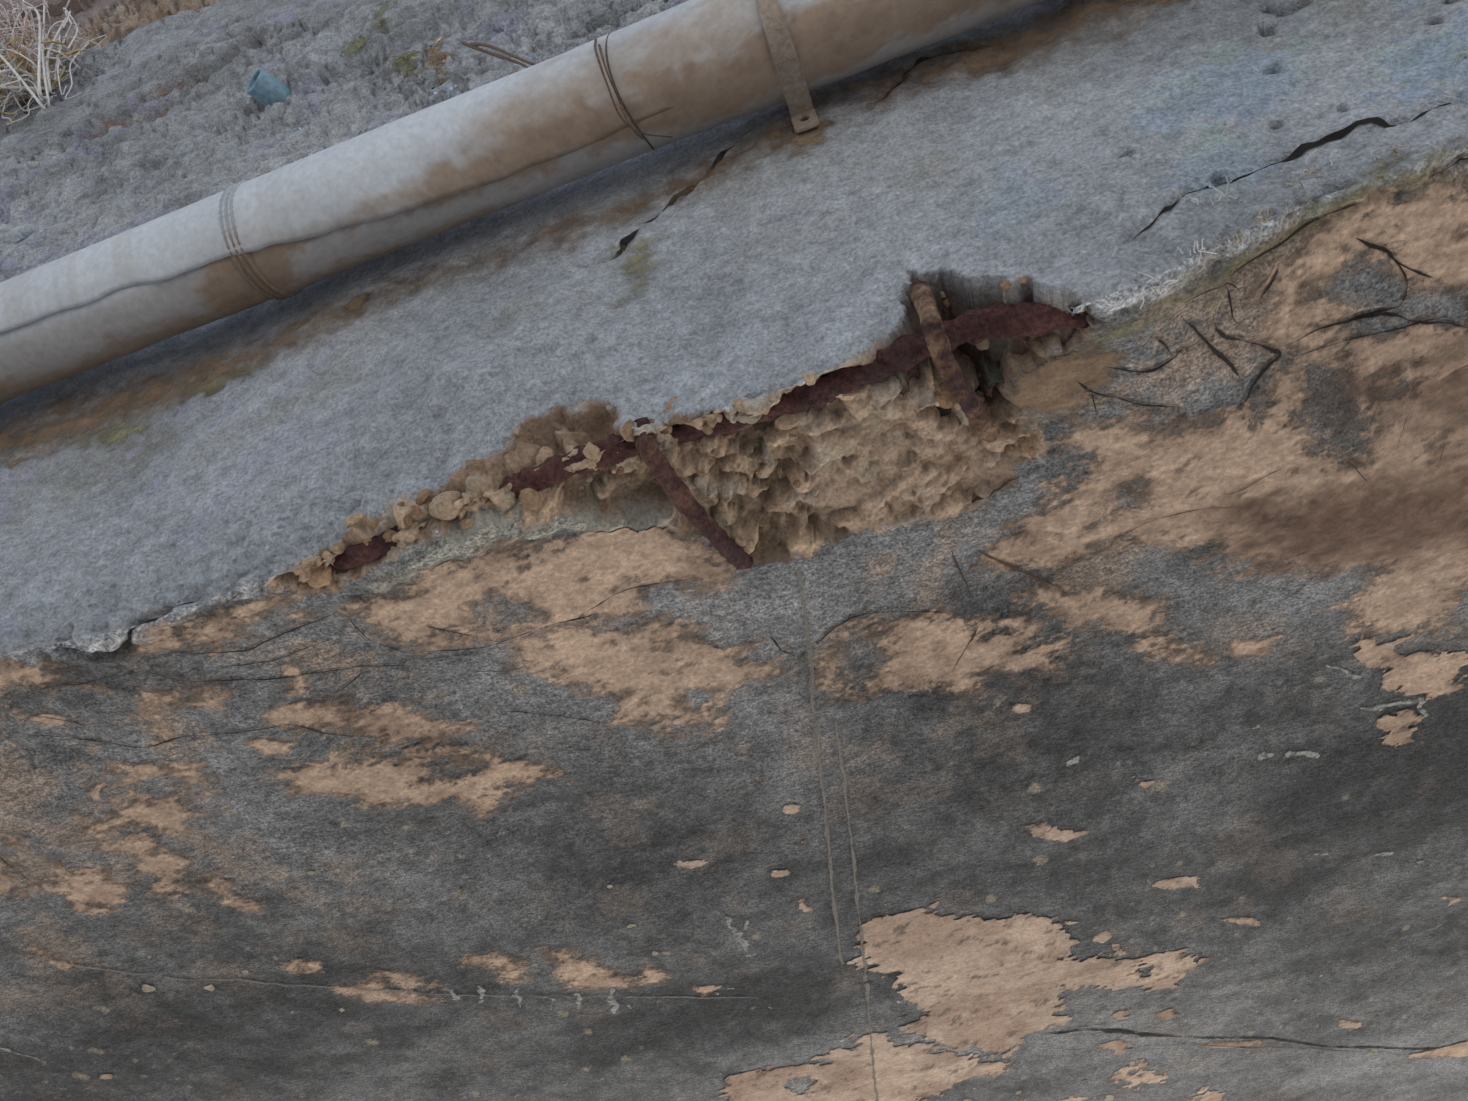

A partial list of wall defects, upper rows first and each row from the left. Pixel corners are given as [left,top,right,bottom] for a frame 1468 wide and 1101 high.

crack [590,129,755,267]
crack [1126,103,1451,244]
crack [1077,201,1468,410]
corrosion [1008,348,1124,416]
peeling [126,178,1468,747]
damp [1234,469,1468,564]
peeling [244,662,570,818]
damp [1258,751,1320,760]
efflorescence [1360,698,1428,716]
peeling [0,756,268,918]
peeling [1023,822,1090,842]
damp [726,917,755,957]